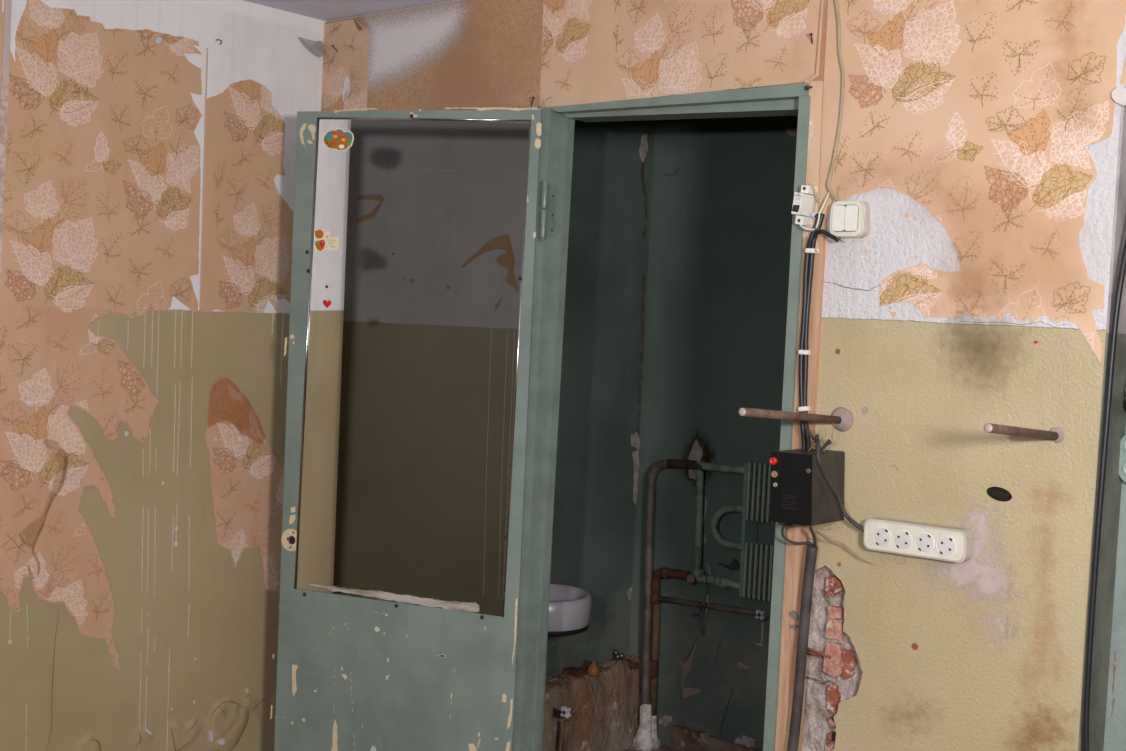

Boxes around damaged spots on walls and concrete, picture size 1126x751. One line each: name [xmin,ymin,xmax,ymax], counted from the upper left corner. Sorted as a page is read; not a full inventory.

peeling [298,37,325,57]
peeling [300,123,316,146]
leakage [173,312,193,476]
peeling [684,432,714,480]
flaking render [802,562,863,751]